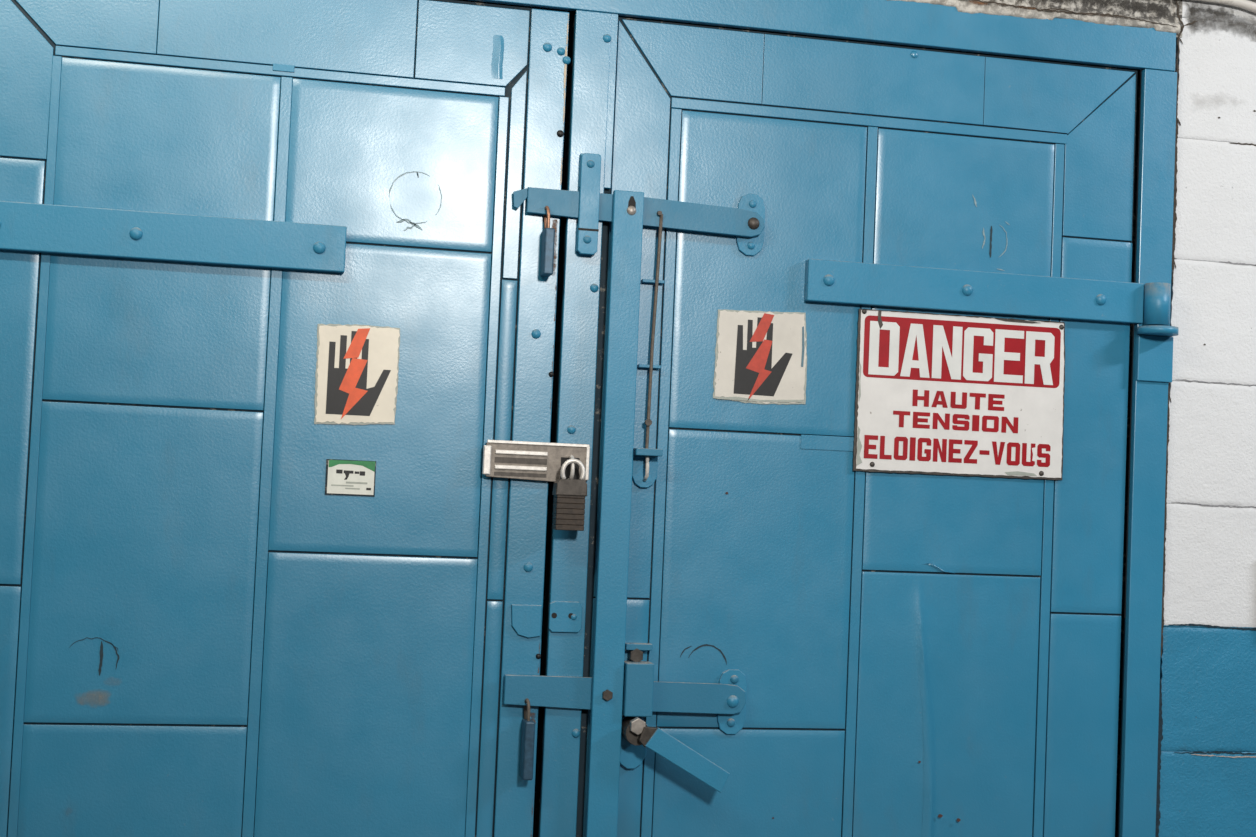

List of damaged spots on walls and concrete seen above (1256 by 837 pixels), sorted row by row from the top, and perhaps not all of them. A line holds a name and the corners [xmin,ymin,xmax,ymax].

damp [1051,0,1170,16]
damp [1188,5,1256,37]